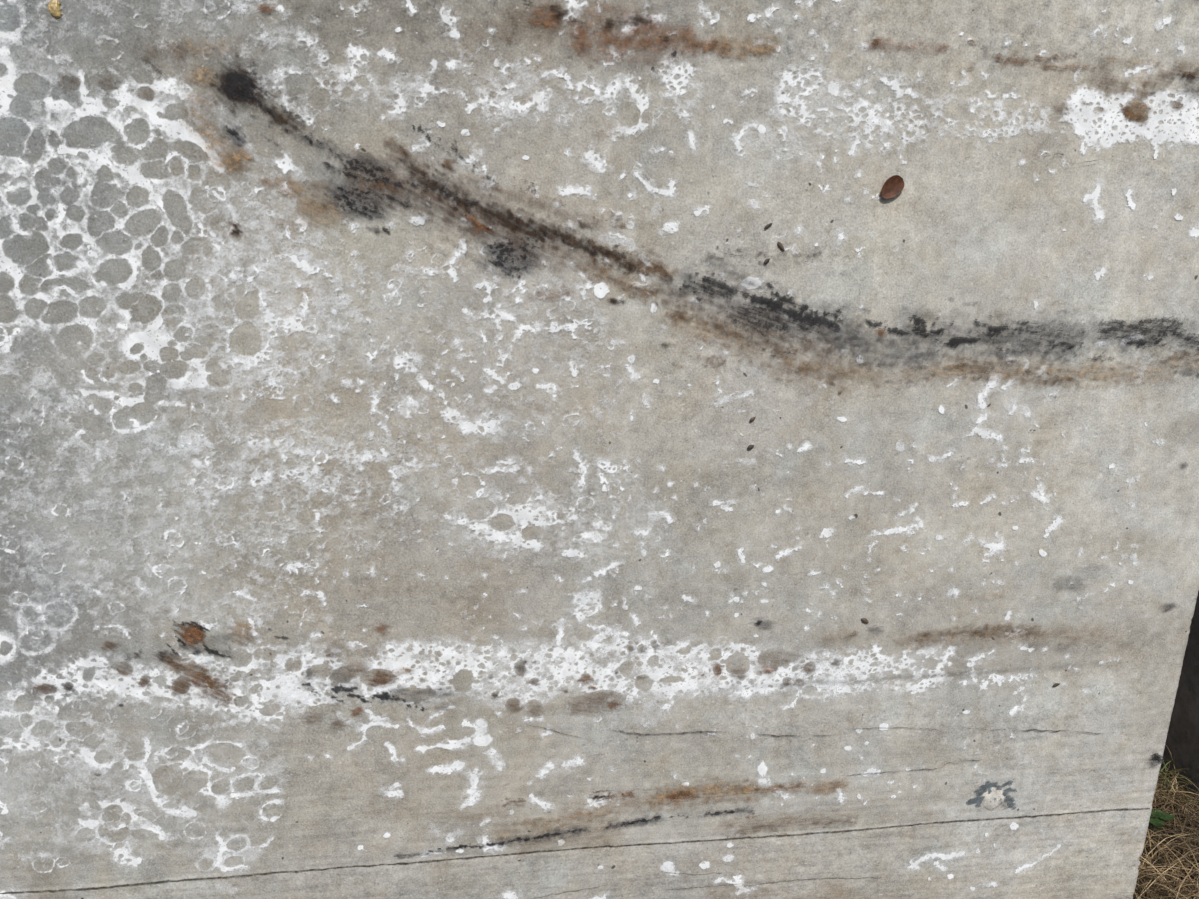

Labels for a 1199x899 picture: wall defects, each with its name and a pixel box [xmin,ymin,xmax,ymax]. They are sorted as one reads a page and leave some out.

rust [525,0,776,56]
leakage [209,55,1199,385]
rust [158,621,249,698]
leakage [302,668,434,715]